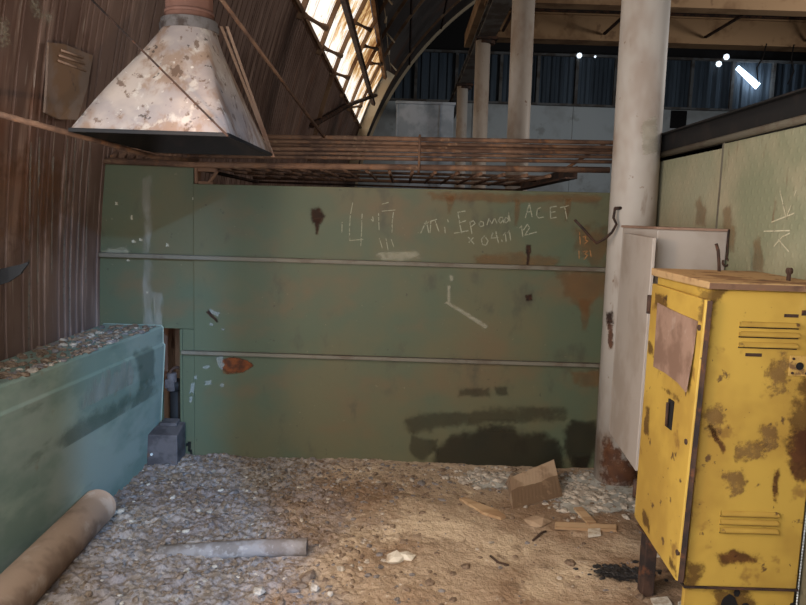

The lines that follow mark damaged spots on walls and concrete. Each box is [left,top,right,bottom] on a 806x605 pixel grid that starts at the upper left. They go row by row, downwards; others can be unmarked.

rust [311,208,325,234]
spalling [221,357,253,374]
damp [436,420,596,489]
rust [600,439,637,486]